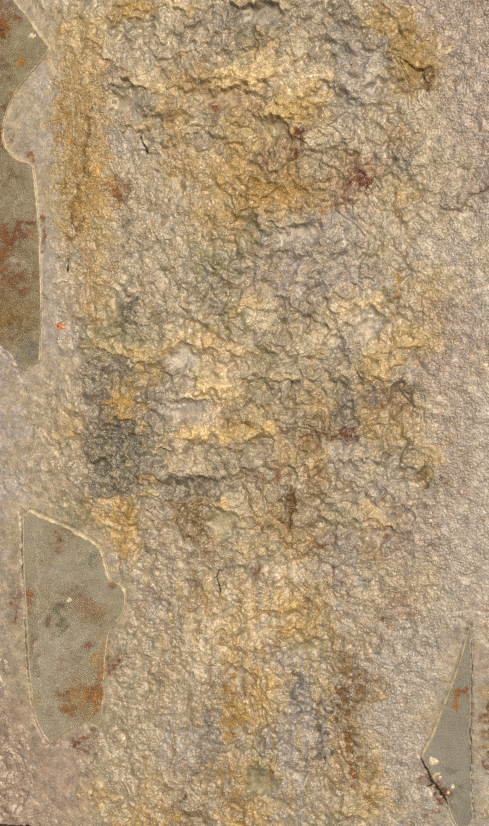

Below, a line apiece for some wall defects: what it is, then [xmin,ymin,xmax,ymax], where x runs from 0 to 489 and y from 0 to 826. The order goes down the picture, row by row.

flaking render [96,0,356,151]
flaking render [226,183,329,249]
corrosion [0,215,45,295]
flaking render [79,282,423,386]
flaking render [156,386,214,426]
flaking render [233,419,307,495]
flaking render [160,460,238,544]
flaking render [361,502,403,548]
flaking render [241,594,330,659]
corrosion [59,635,121,716]
flaking render [224,651,285,714]
flaking render [236,752,289,807]